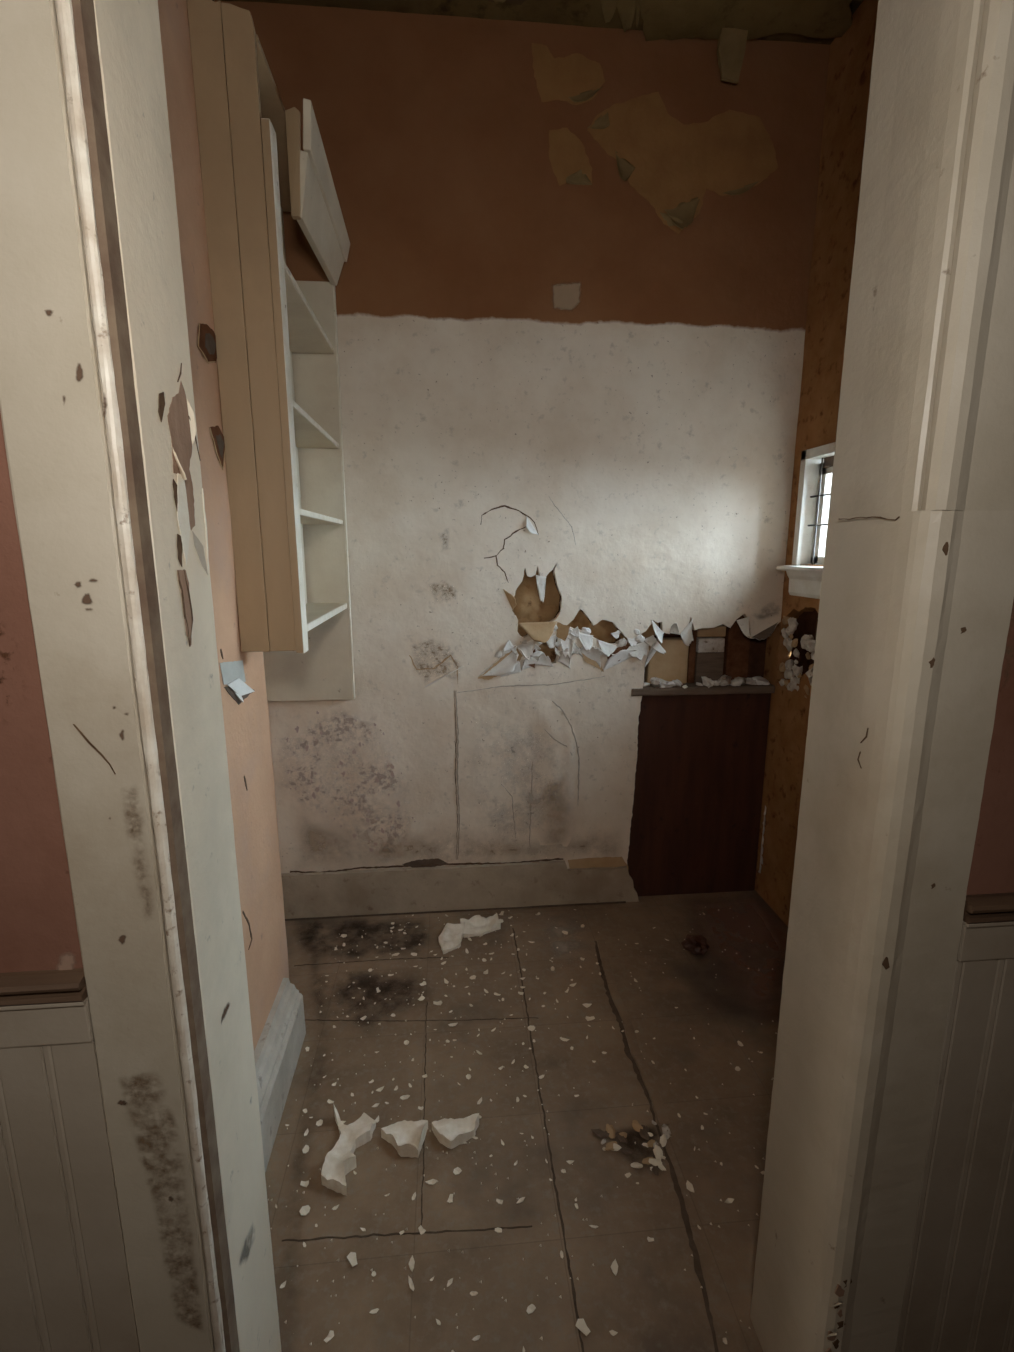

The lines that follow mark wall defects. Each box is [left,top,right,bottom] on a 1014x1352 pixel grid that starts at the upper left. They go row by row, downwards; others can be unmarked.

peeling [158,363,226,647]
crack [480,497,576,583]
flaking render [503,570,581,657]
peeling [611,628,638,647]
spalling [747,638,767,678]
leakage [305,922,424,956]
leakage [340,976,411,1023]
crack [594,940,719,1352]